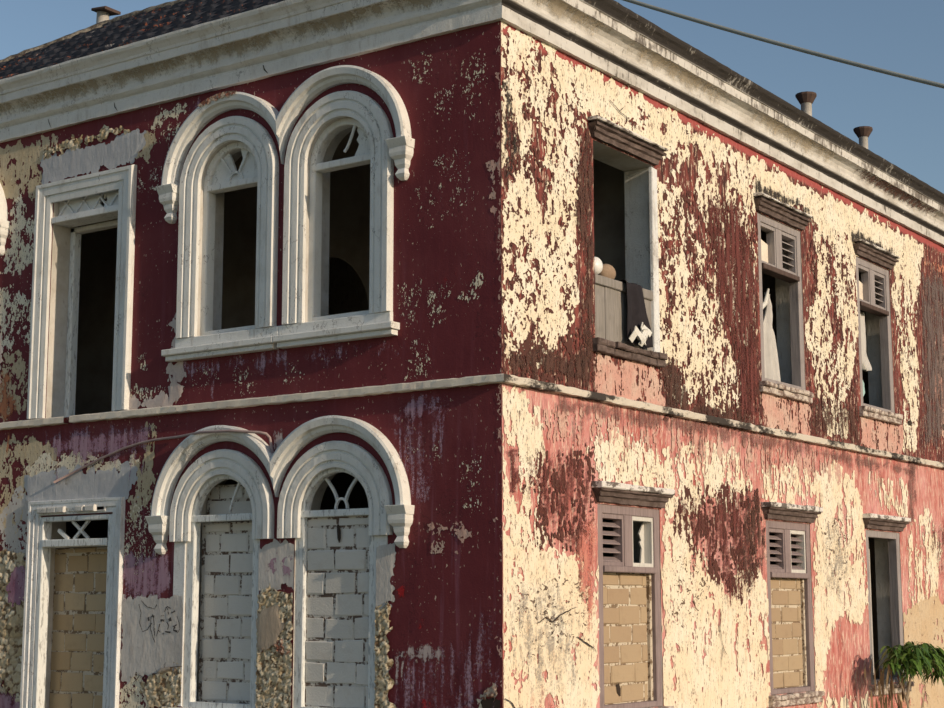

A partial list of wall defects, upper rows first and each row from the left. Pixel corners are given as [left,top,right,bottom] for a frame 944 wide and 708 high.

peeling [135,91,237,194]
peeling [0,125,131,422]
flaking render [129,361,219,423]
peeling [397,21,944,708]
spalling [0,422,168,705]
flaking render [119,594,183,708]
spalling [255,538,294,708]